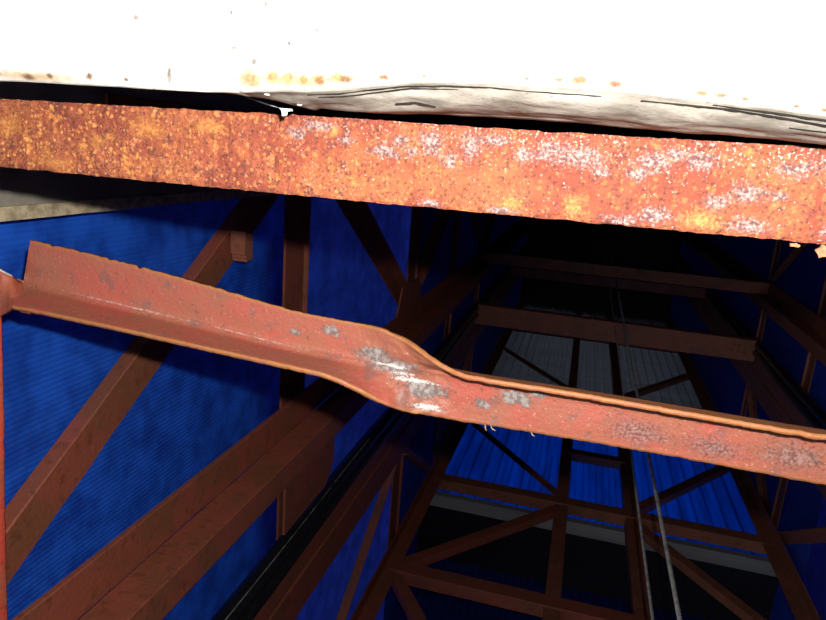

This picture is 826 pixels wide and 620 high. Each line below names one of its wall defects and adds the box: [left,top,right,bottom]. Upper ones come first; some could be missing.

corrosion [244,72,388,88]
corrosion [572,73,621,87]
corrosion [190,118,228,134]
corrosion [78,134,119,152]
corrosion [675,211,722,229]
corrosion [815,244,826,258]
peeling [358,345,449,412]
peeling [476,390,546,410]